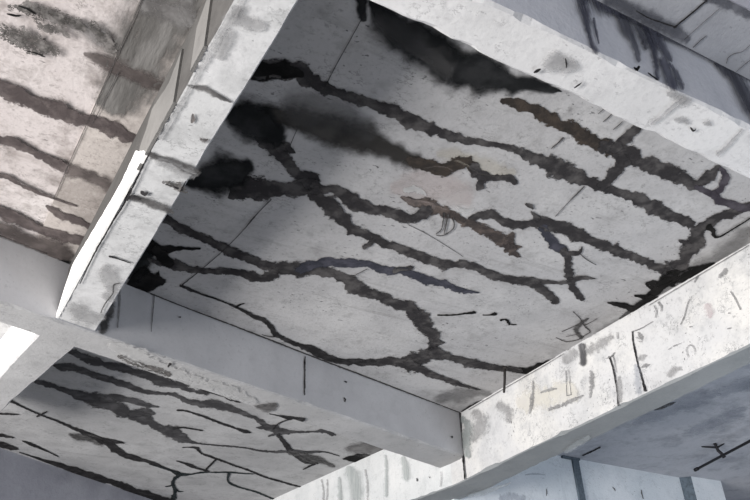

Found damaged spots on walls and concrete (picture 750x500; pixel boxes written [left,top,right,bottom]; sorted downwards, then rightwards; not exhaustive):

leakage [0,0,205,143]
leakage [215,9,265,60]
leakage [356,0,562,95]
leakage [577,0,750,125]
leakage [0,135,112,192]
leakage [265,106,518,191]
leakage [0,173,90,264]
crack [79,0,750,437]
crack [0,363,336,500]